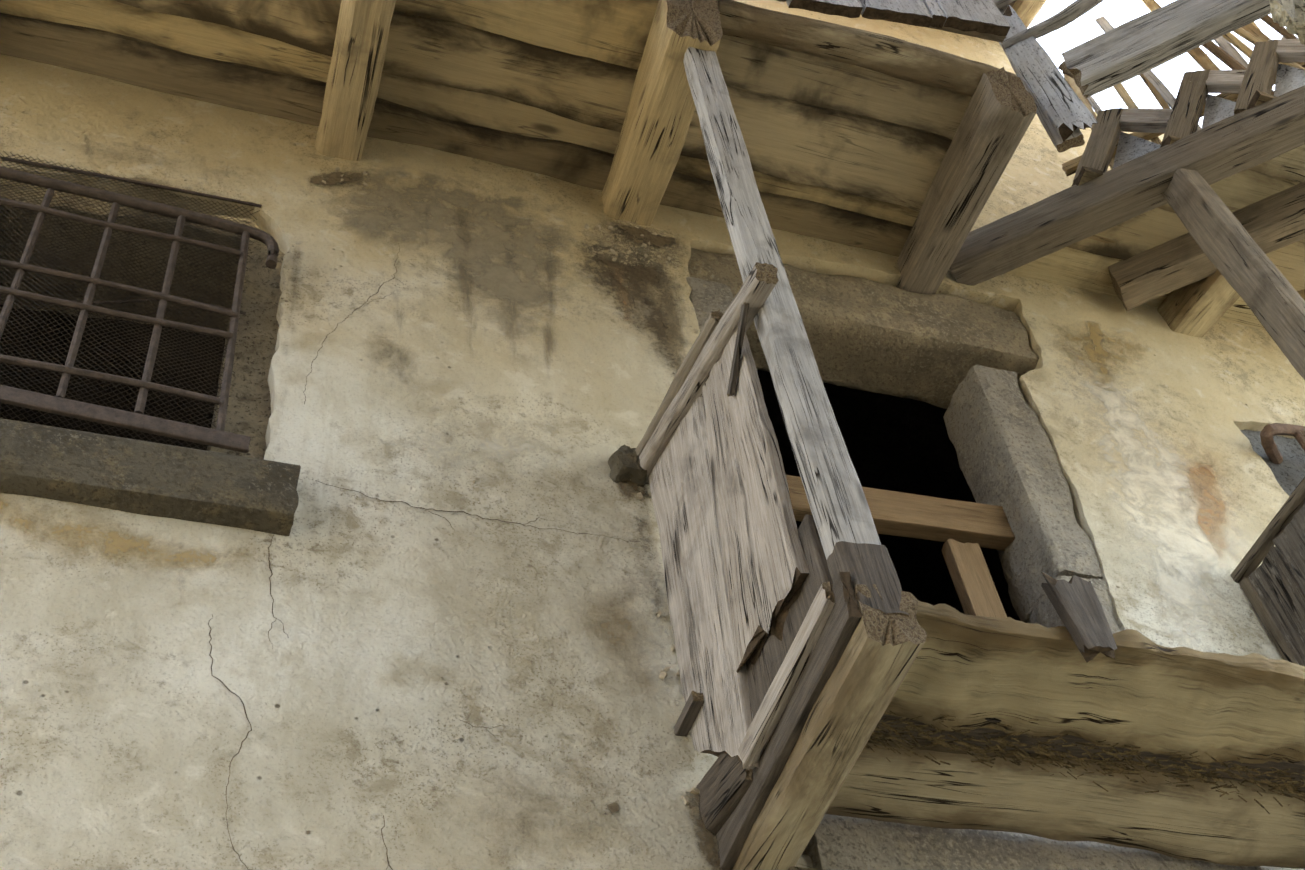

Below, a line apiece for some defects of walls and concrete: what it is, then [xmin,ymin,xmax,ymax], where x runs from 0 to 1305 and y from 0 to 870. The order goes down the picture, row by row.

crack [303,244,405,404]
damp [344,171,561,327]
damp [580,222,683,370]
crack [268,535,286,641]
crack [315,480,640,542]
crack [208,614,252,870]